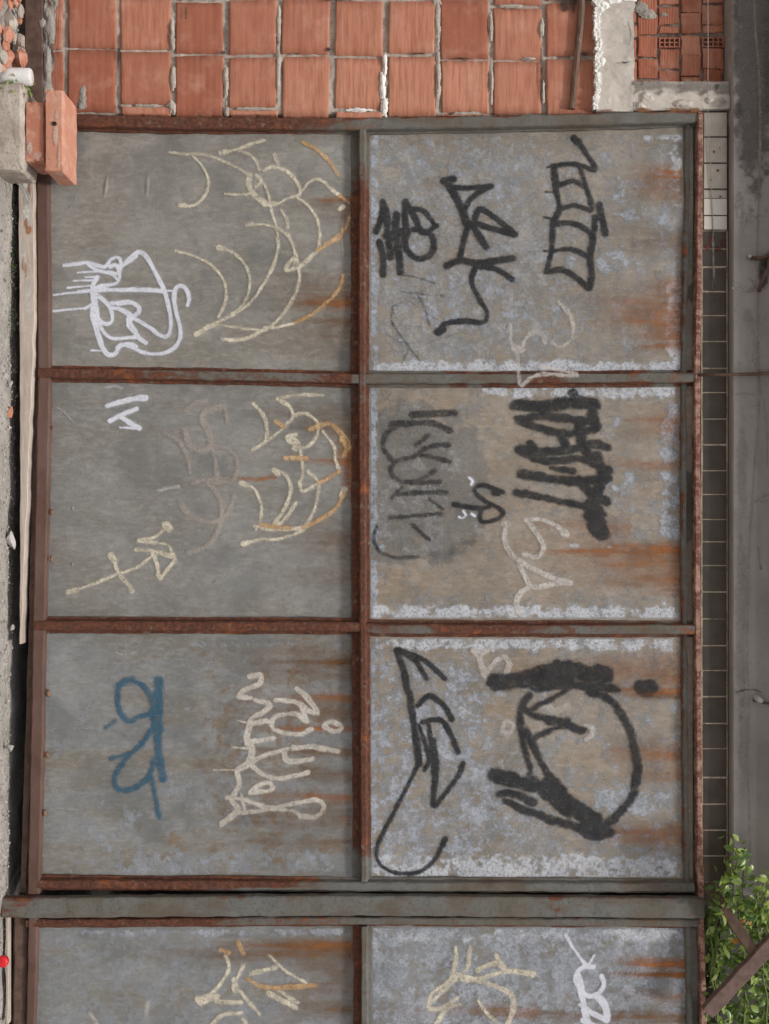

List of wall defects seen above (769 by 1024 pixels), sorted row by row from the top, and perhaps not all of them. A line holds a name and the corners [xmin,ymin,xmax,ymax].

spalling [591,0,637,112]
spalling [635,91,654,109]
spalling [672,97,714,108]